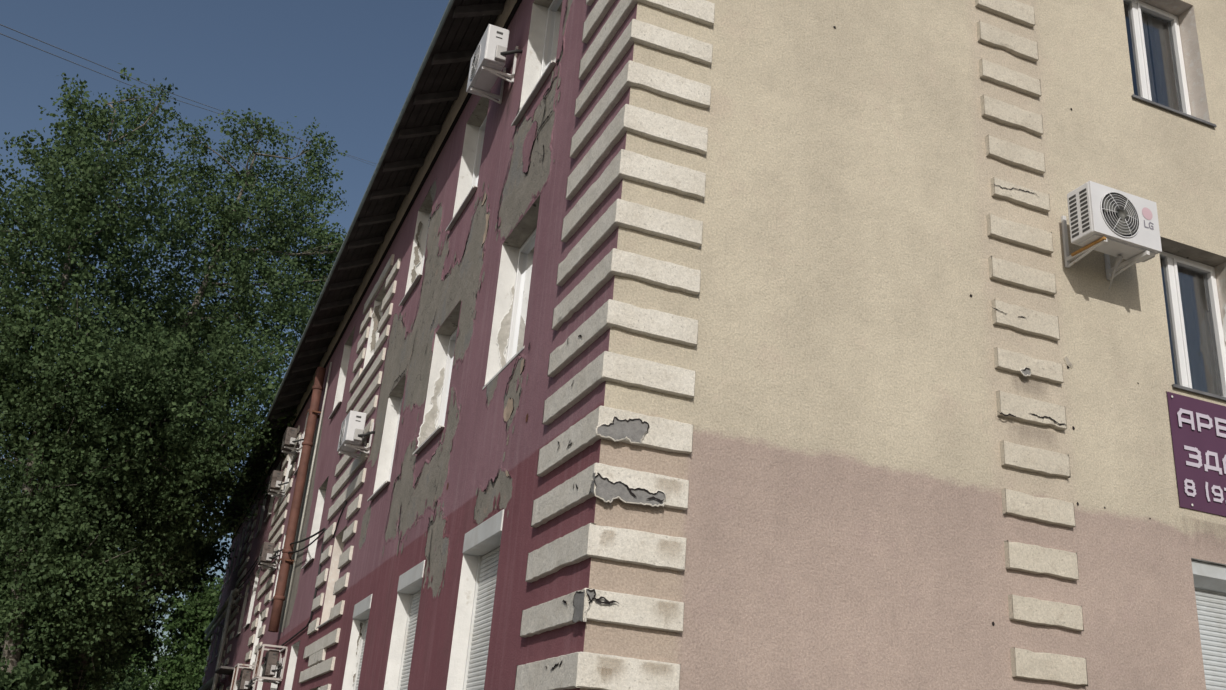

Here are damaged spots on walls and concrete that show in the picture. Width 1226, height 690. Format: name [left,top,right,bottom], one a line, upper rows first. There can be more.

peeling [367,0,574,601]
spalling [596,416,650,444]
crack [999,412,1066,425]
spalling [573,472,666,507]
spalling [562,588,618,622]